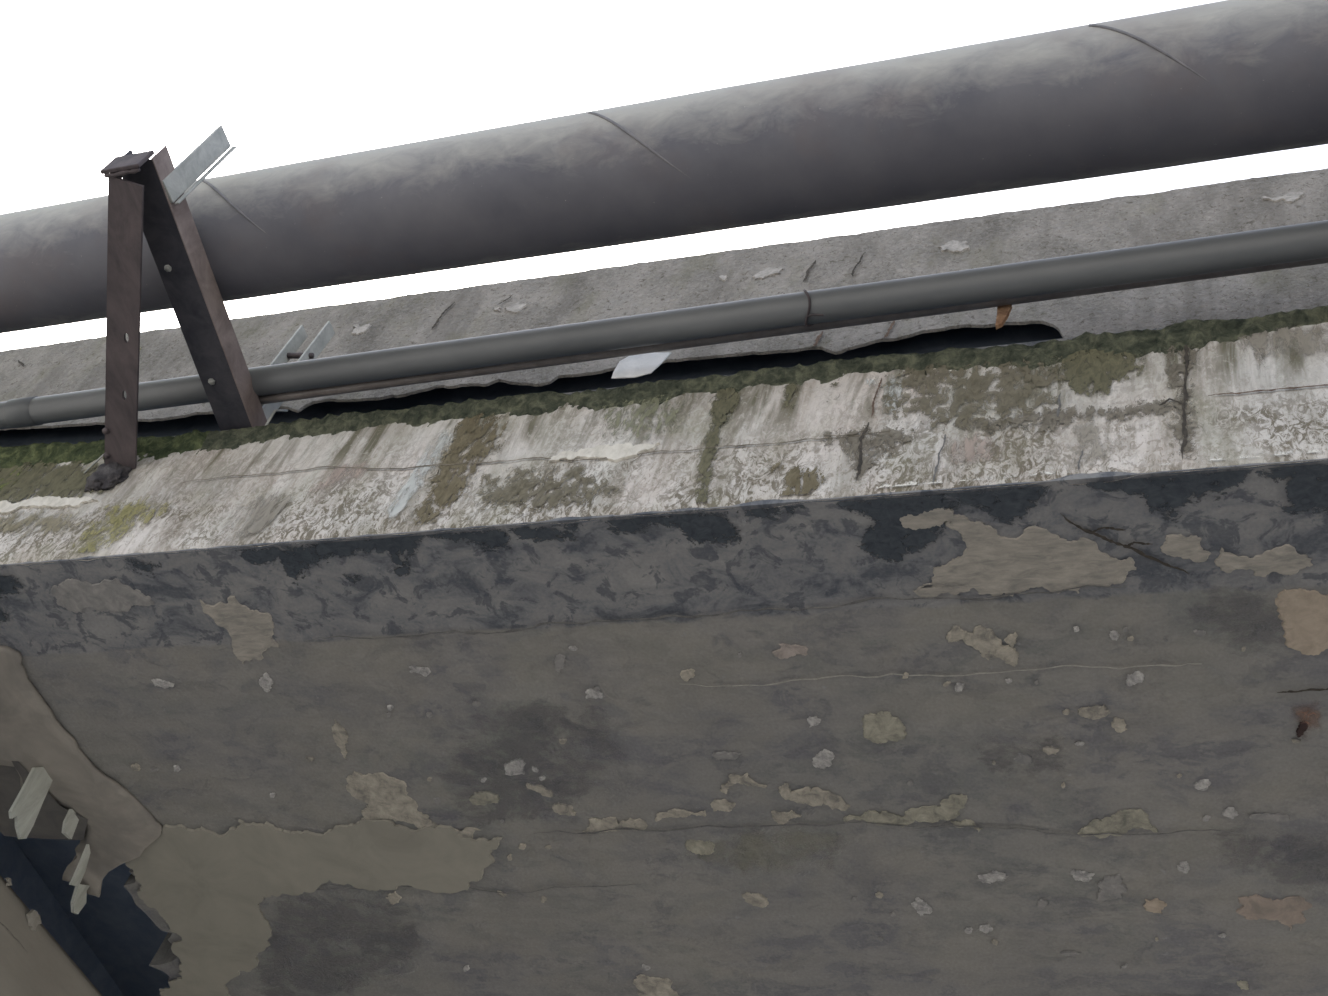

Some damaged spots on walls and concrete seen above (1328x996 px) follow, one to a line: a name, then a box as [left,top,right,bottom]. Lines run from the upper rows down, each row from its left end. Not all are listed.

crack [1160,345,1328,459]
leakage [605,387,825,548]
leakage [0,509,86,538]
peeling [900,507,1136,598]
crack [1060,513,1189,574]
leakage [0,575,24,622]
peeling [1160,534,1328,656]
peeling [946,625,1019,667]
peeling [151,678,174,689]
peeling [862,711,907,744]
spalling [331,719,480,838]
peeling [26,909,42,931]